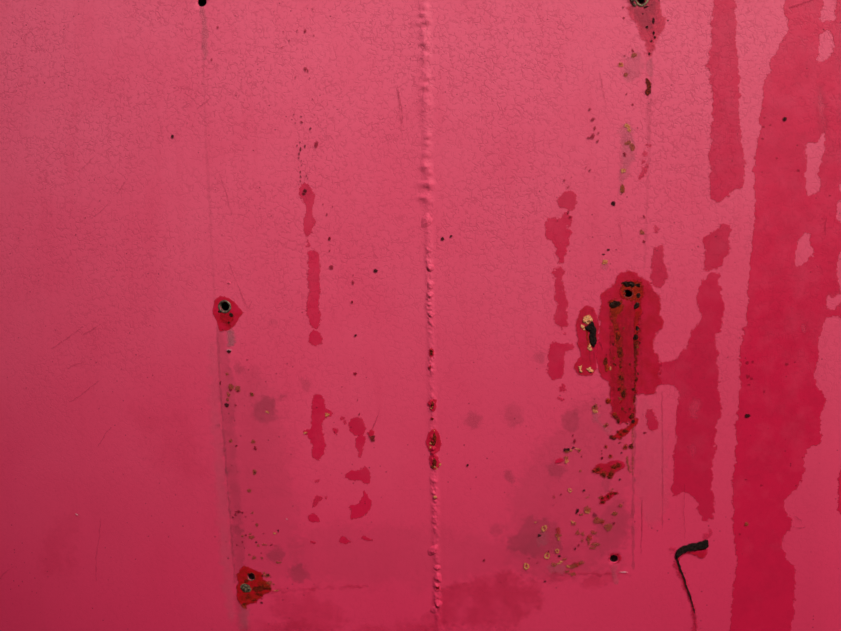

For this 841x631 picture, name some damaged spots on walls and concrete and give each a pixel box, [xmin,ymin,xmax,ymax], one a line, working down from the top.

rust [592,270,664,481]
rust [236,523,279,609]
rust [571,504,623,550]
rust [599,492,619,504]